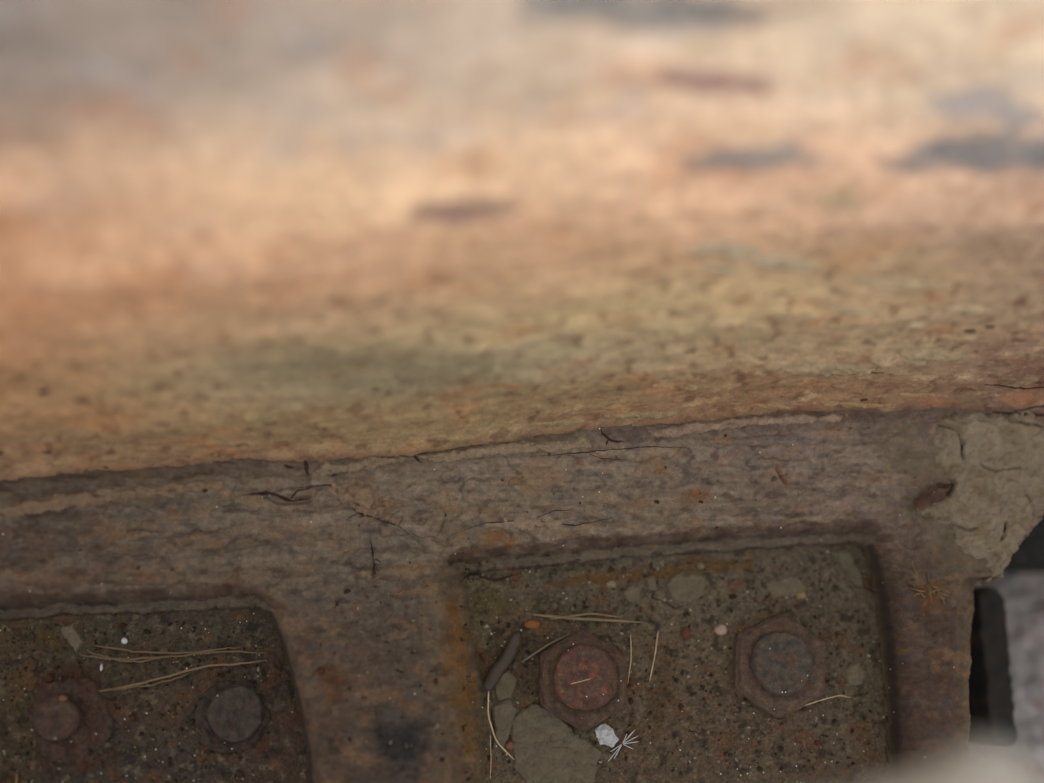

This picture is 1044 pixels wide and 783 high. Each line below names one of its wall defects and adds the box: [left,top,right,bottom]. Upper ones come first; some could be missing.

crack [241,461,419,571]
crack [452,509,619,535]
spalling [913,483,952,512]
corrosion [864,737,1044,783]